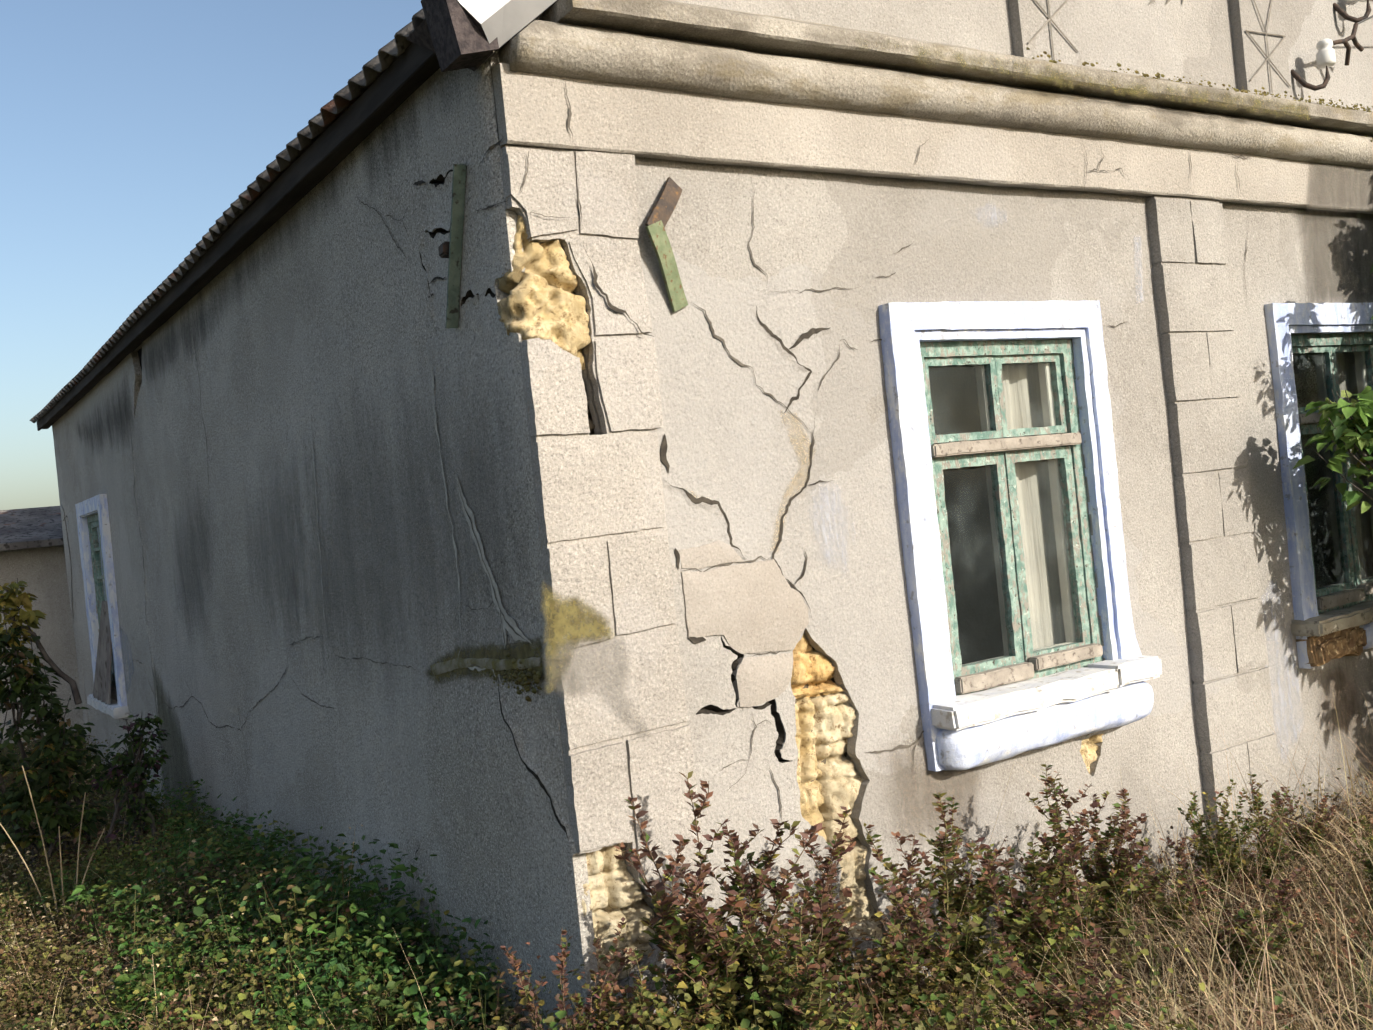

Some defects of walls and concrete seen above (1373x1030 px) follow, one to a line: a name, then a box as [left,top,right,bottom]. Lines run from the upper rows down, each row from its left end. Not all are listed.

spalling [497,215,591,370]
crack [360,81,654,855]
crack [660,176,914,613]
crack [127,636,415,731]
crack [688,636,796,820]
spalling [788,633,882,938]
crack [865,731,924,771]
spalling [581,843,658,993]